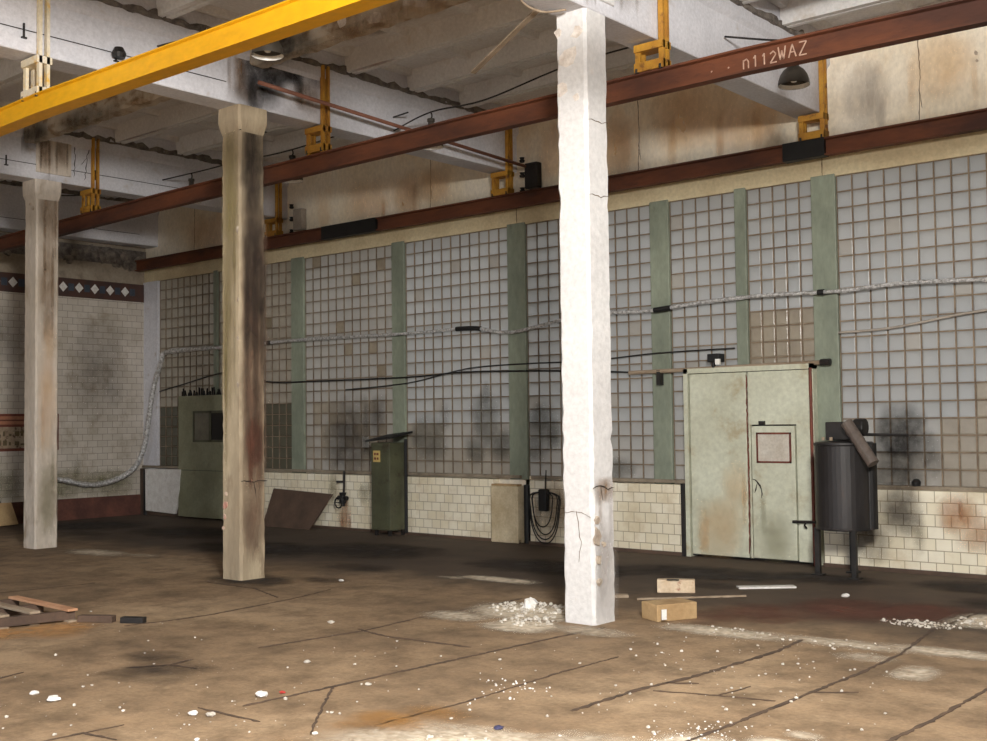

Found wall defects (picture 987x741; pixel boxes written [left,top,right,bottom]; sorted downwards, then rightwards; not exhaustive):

leakage [23,125,62,162]
spalling [58,242,146,272]